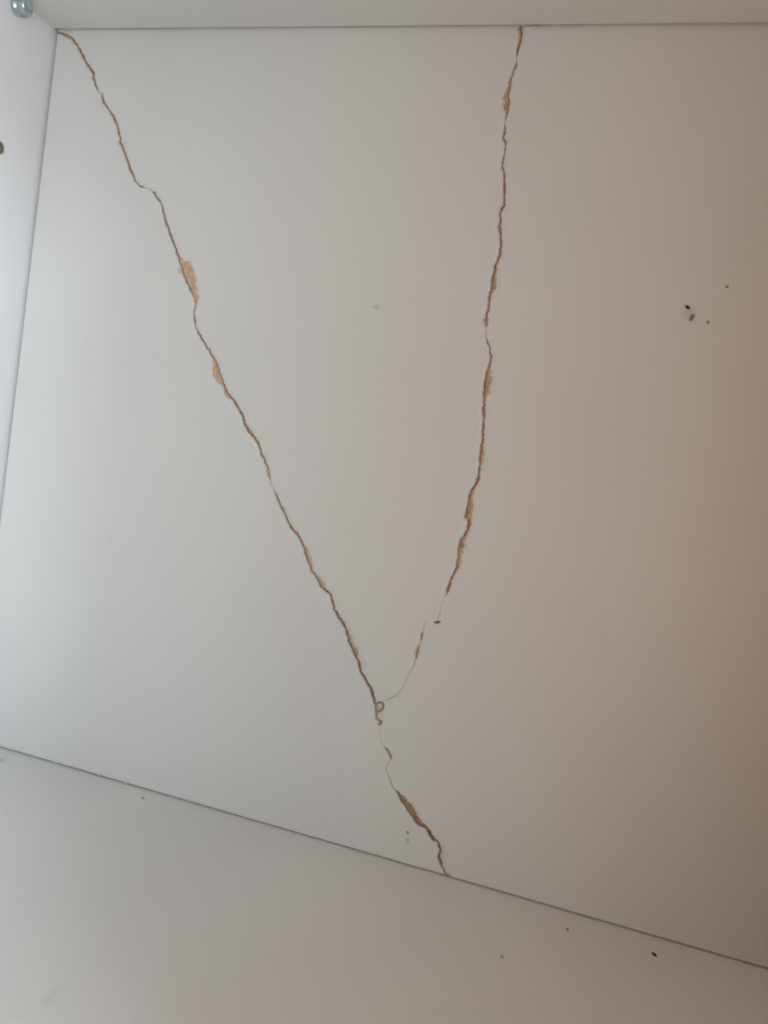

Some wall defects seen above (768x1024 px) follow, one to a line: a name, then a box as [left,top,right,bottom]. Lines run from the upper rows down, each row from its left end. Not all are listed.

crack [57,25,527,876]